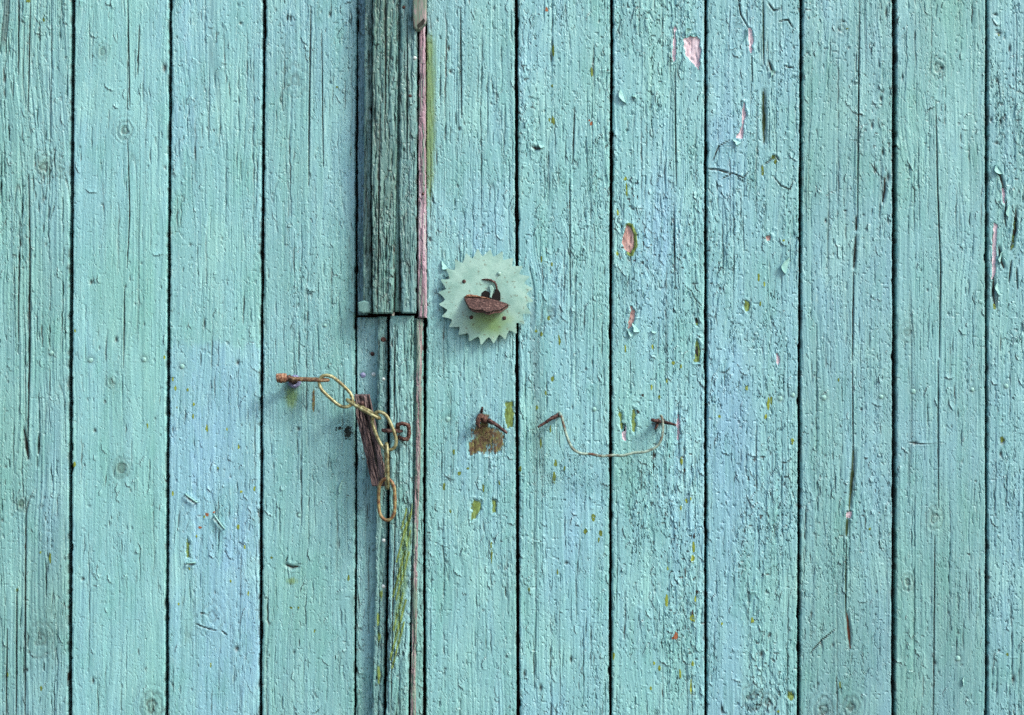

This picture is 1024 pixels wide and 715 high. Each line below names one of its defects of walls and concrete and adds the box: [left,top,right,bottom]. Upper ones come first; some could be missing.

peeling [672,27,701,70]
peeling [733,103,746,145]
crack [854,47,862,171]
peeling [616,210,637,256]
crack [852,177,885,356]
peeling [991,188,1015,309]
peeling [625,306,656,353]
rust [469,413,504,455]
crack [810,383,854,654]